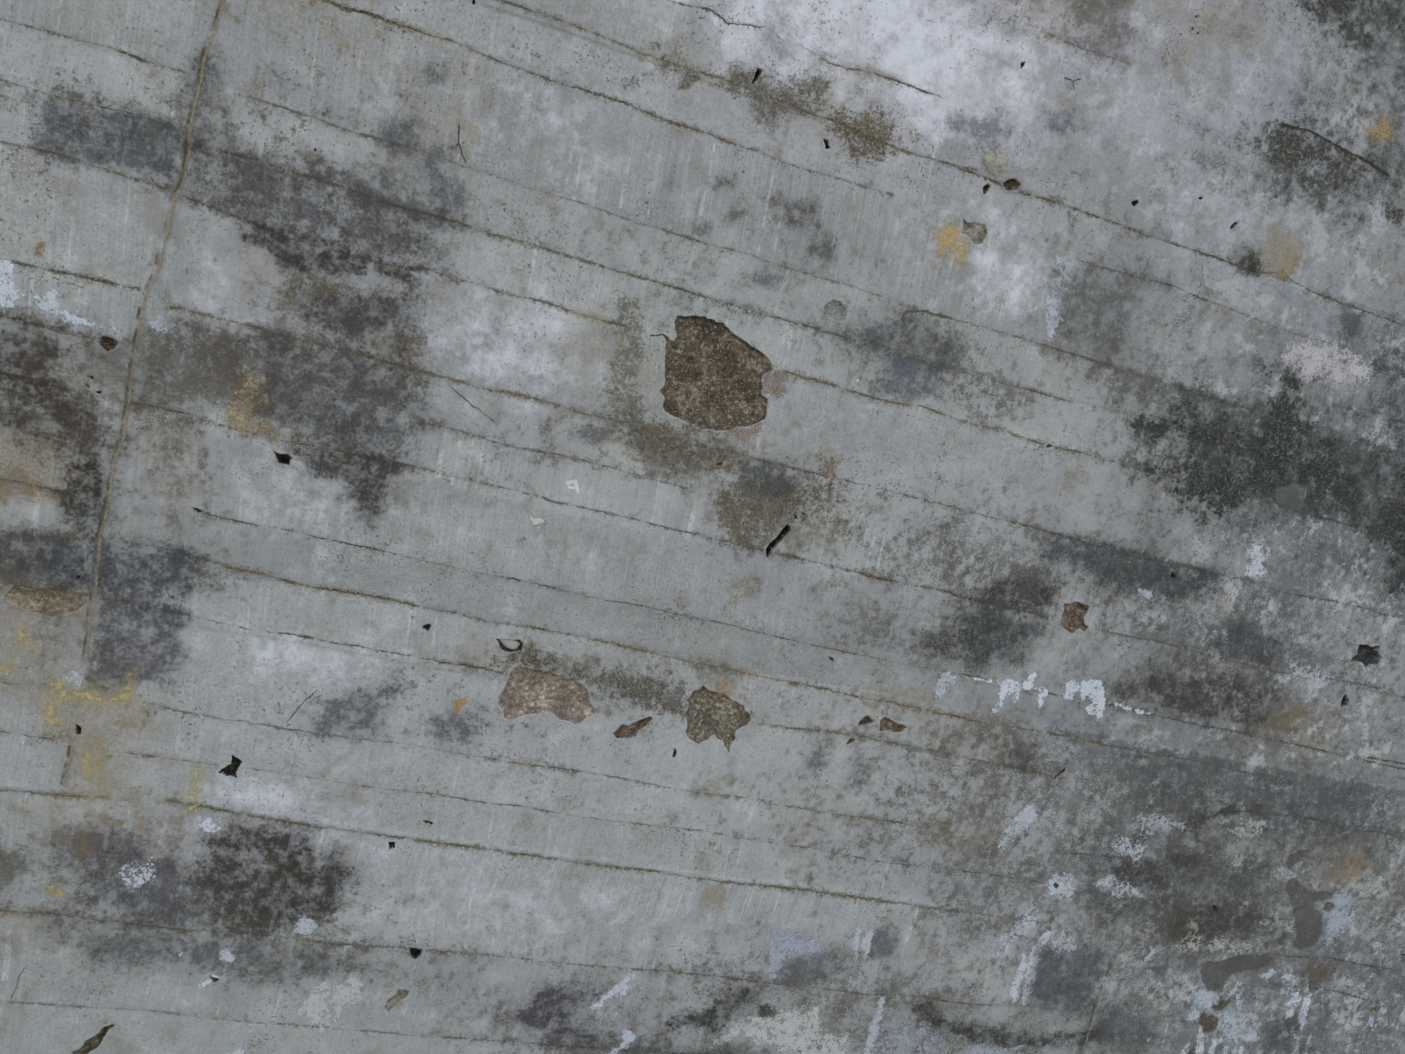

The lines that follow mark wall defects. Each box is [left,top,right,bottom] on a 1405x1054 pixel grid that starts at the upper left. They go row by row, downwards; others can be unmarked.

leakage [34,104,466,529]
spalling [656,312,777,434]
leakage [1270,331,1384,401]
spalling [0,583,94,620]
peeling [1058,599,1092,636]
leakage [1243,544,1267,579]
spalling [490,637,754,755]
leakage [31,817,365,1033]